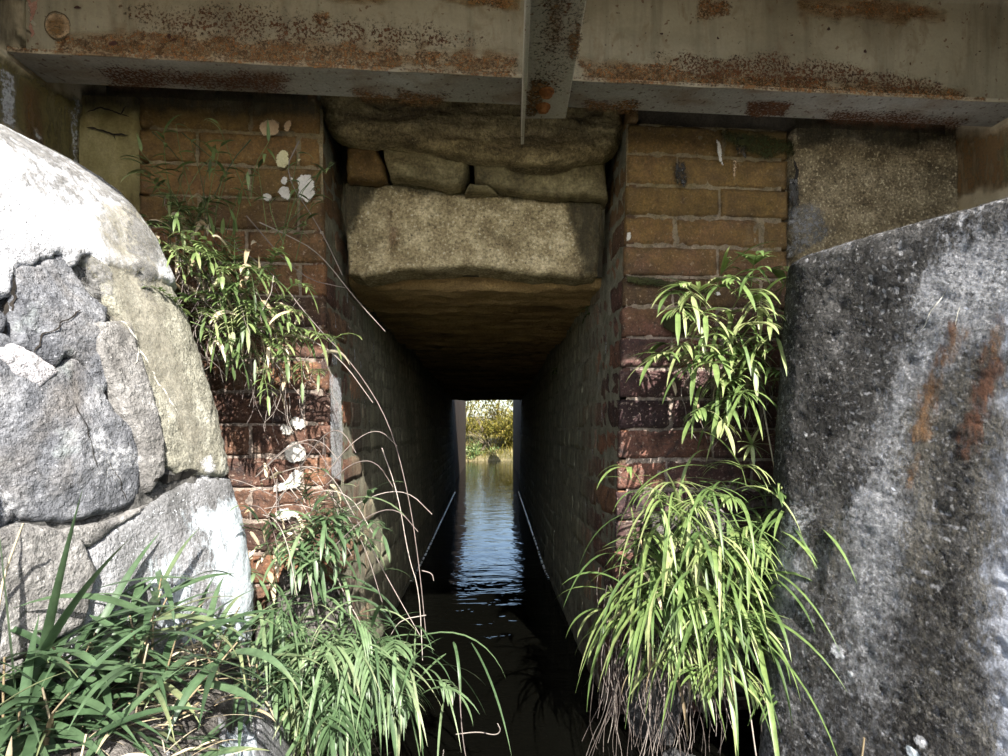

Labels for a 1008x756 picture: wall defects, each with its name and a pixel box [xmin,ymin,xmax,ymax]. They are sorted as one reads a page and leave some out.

corrosion [6,3,518,93]
corrosion [450,0,519,10]
corrosion [526,0,986,119]
corrosion [816,107,969,131]
water stain [759,121,1008,756]